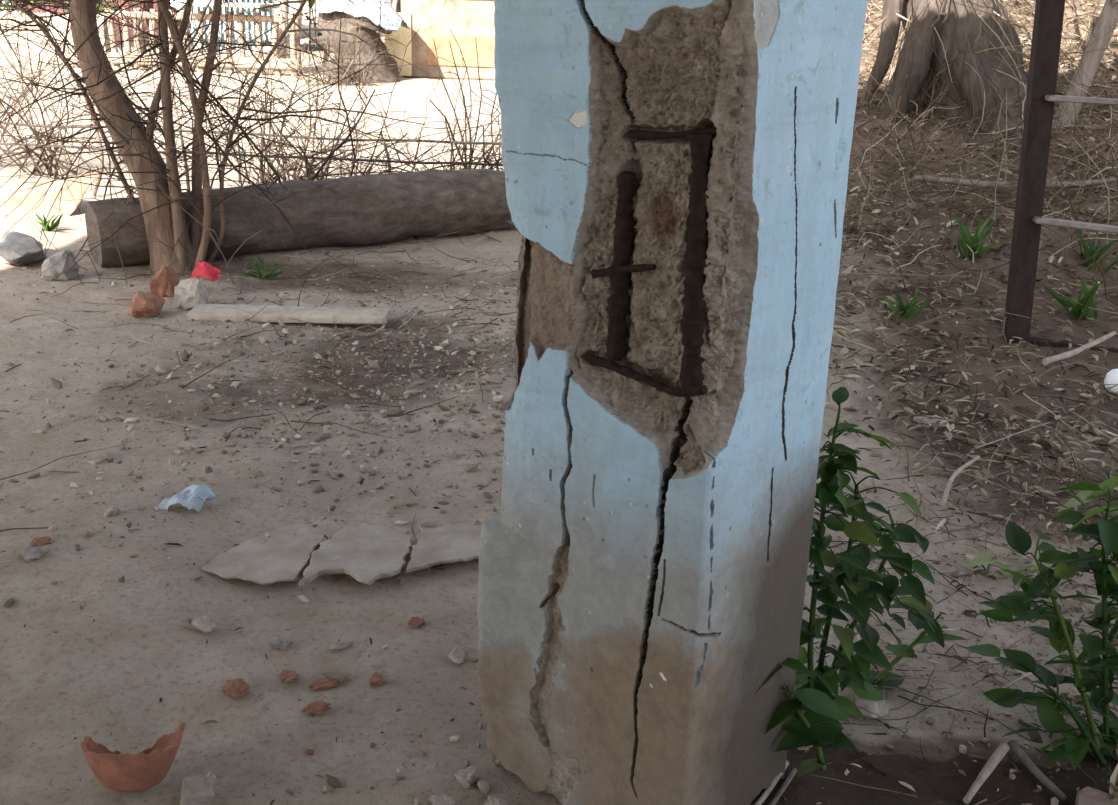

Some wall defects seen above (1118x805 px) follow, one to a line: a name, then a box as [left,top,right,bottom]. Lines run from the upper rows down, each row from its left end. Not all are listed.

crack [580,0,641,144]
spalling [499,0,781,479]
crack [767,86,798,561]
crack [531,369,574,748]
crack [632,400,721,777]